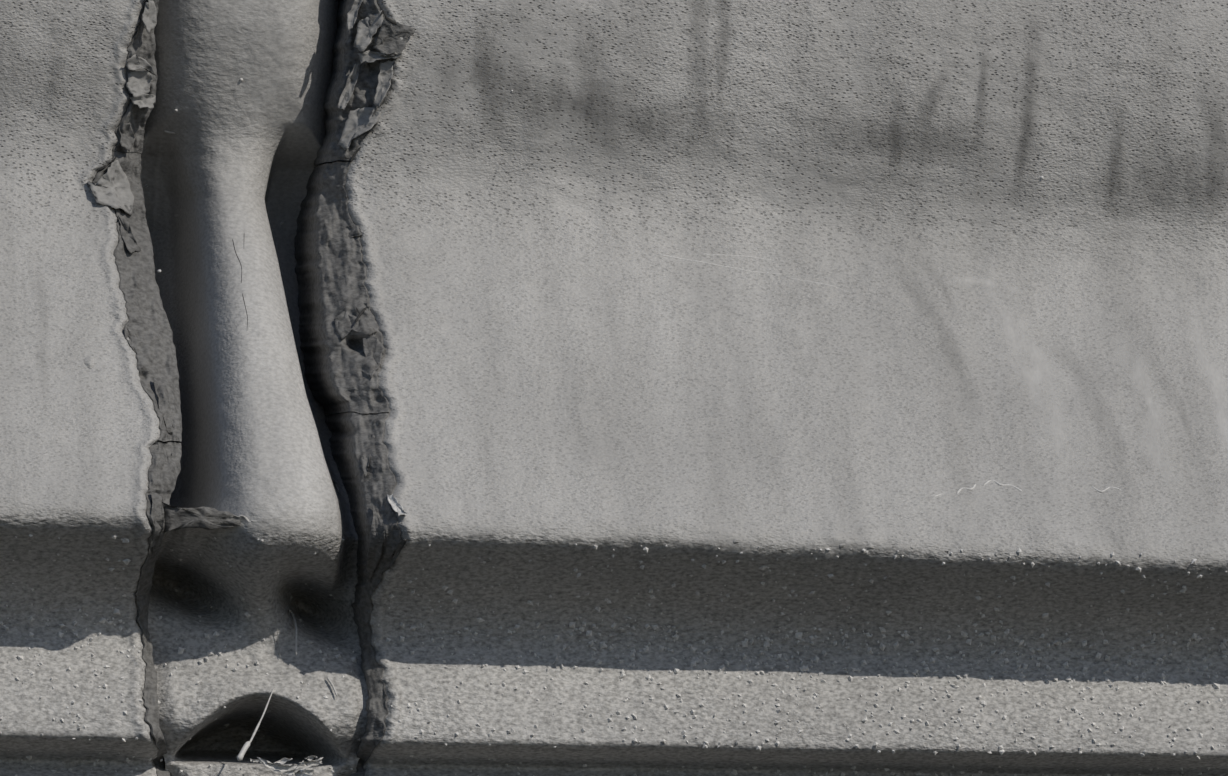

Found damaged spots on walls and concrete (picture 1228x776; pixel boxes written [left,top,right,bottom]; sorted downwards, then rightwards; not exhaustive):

spalling [87,0,241,776]
spalling [294,0,415,776]